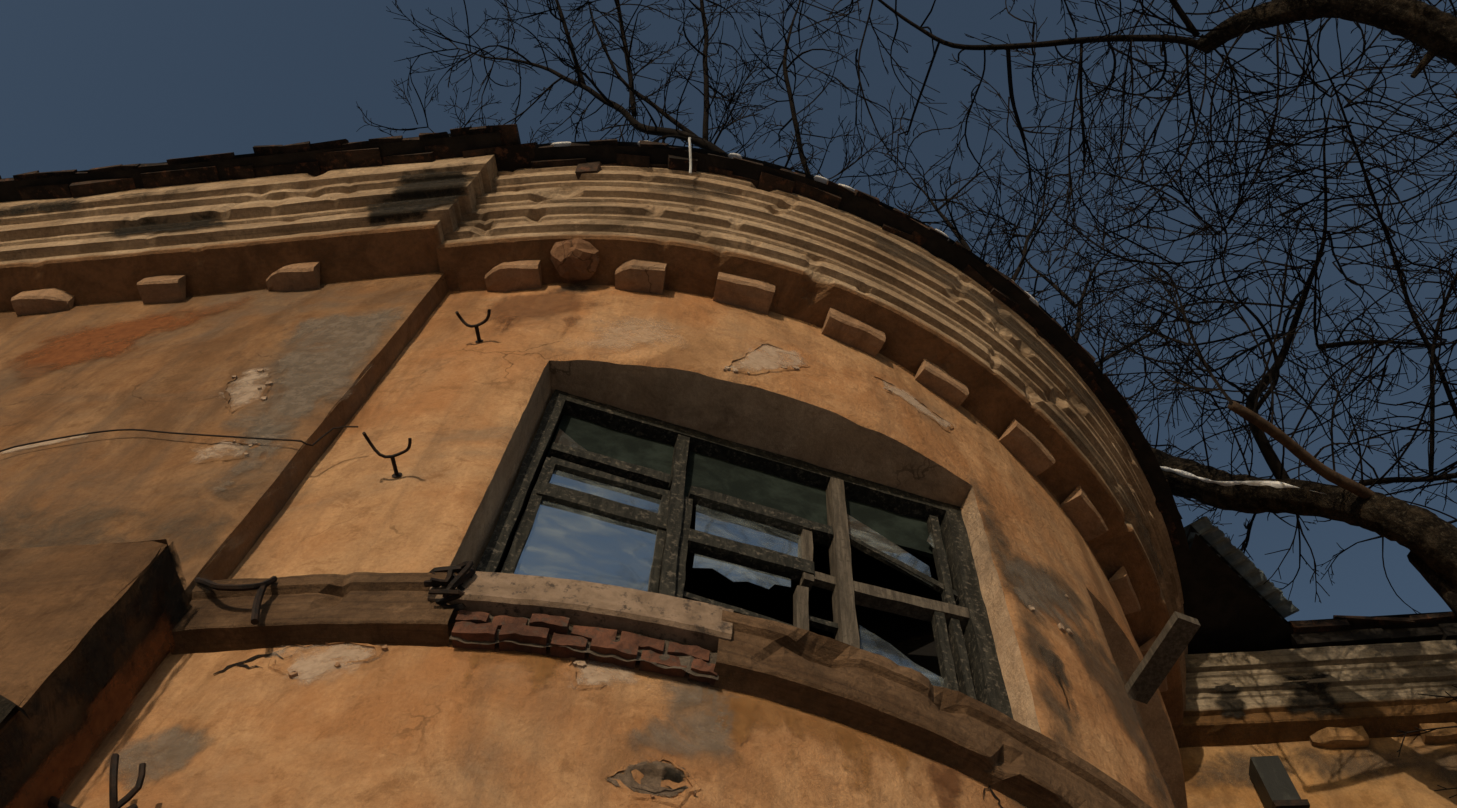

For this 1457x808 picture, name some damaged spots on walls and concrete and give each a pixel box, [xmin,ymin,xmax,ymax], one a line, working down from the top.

peeling [723,343,810,376]
peeling [220,368,273,414]
peeling [872,376,954,434]
peeling [268,642,388,681]
flaking render [449,610,719,691]
hole [604,757,703,808]